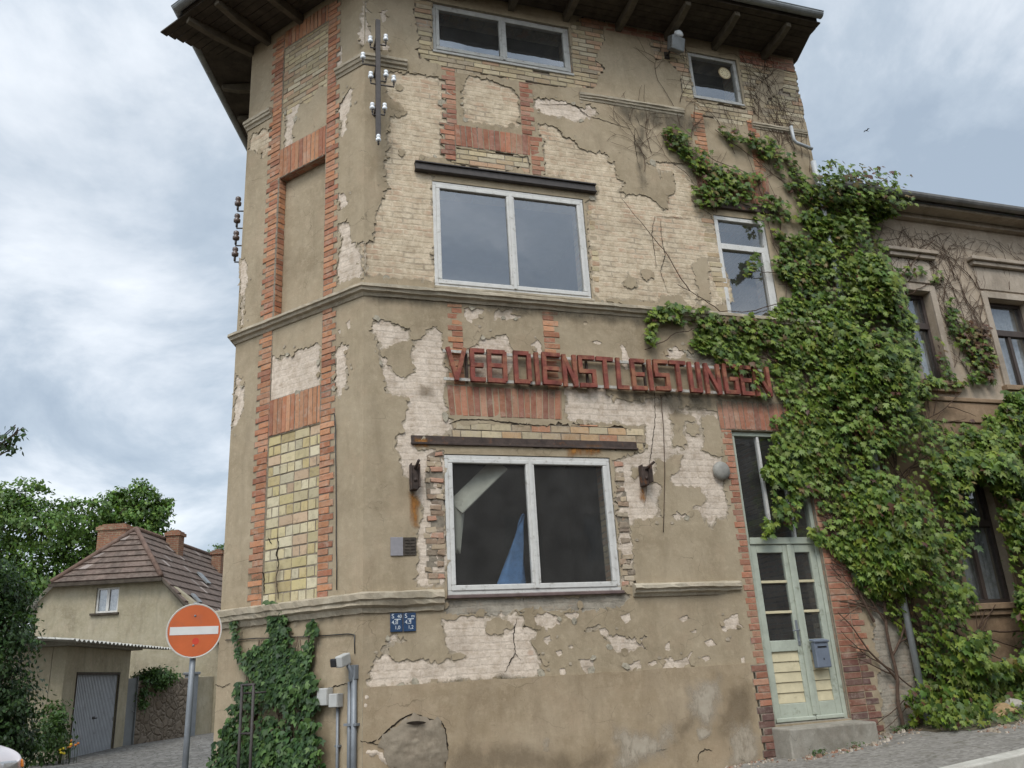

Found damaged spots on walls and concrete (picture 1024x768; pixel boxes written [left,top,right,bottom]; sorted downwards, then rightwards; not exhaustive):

peeling [249,99,303,158]
peeling [334,0,734,309]
peeling [269,320,352,408]
corrosion [411,495,420,525]
peeling [364,306,743,707]
crack [254,534,279,594]